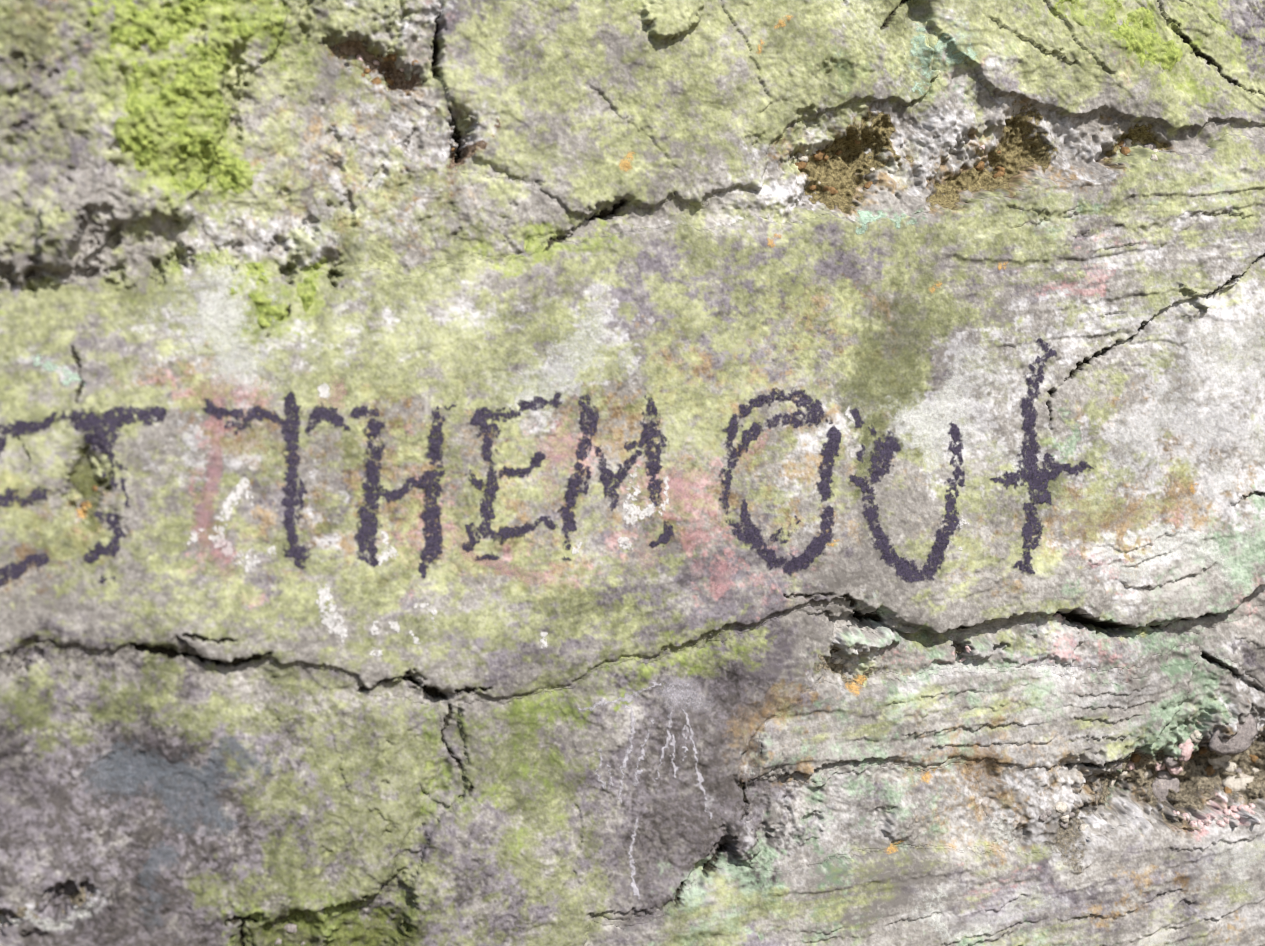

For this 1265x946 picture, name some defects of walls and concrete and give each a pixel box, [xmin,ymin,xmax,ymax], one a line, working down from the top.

crack [431,17,439,76]
crack [1159,6,1263,95]
crack [448,109,461,163]
crack [545,199,626,251]
crack [1207,253,1265,296]
crack [1047,323,1144,397]
crack [784,593,882,622]
crack [134,634,262,666]
crack [359,675,486,797]